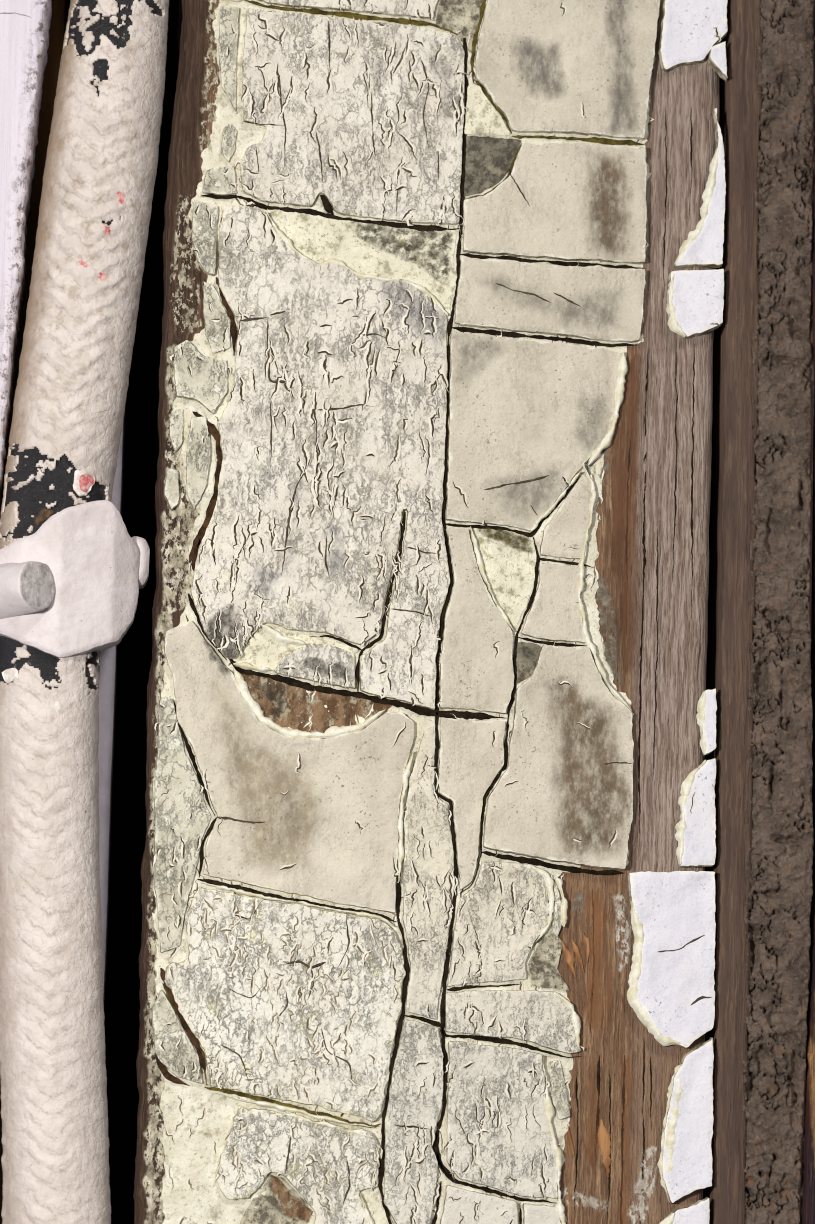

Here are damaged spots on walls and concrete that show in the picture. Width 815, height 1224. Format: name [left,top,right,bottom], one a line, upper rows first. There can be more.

peeling [73,470,95,496]
crack [155,0,695,1224]
peeling [151,0,728,1224]